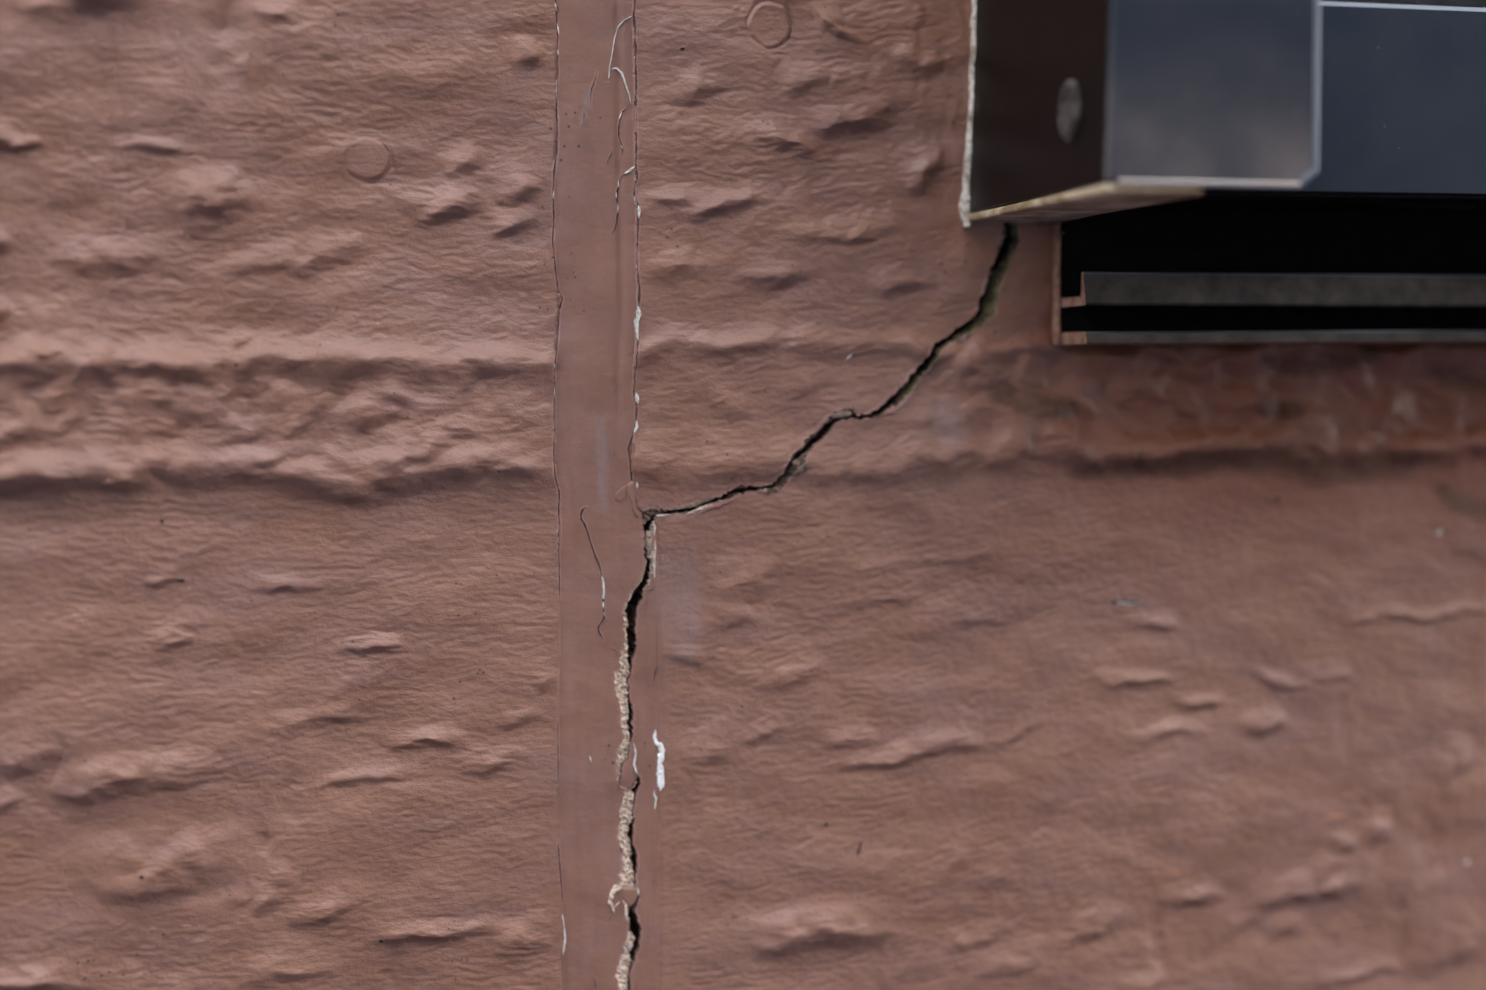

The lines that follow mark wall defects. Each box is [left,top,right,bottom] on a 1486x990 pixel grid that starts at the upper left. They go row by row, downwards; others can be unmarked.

peeling [653,729,666,810]
crack [549,0,1023,990]